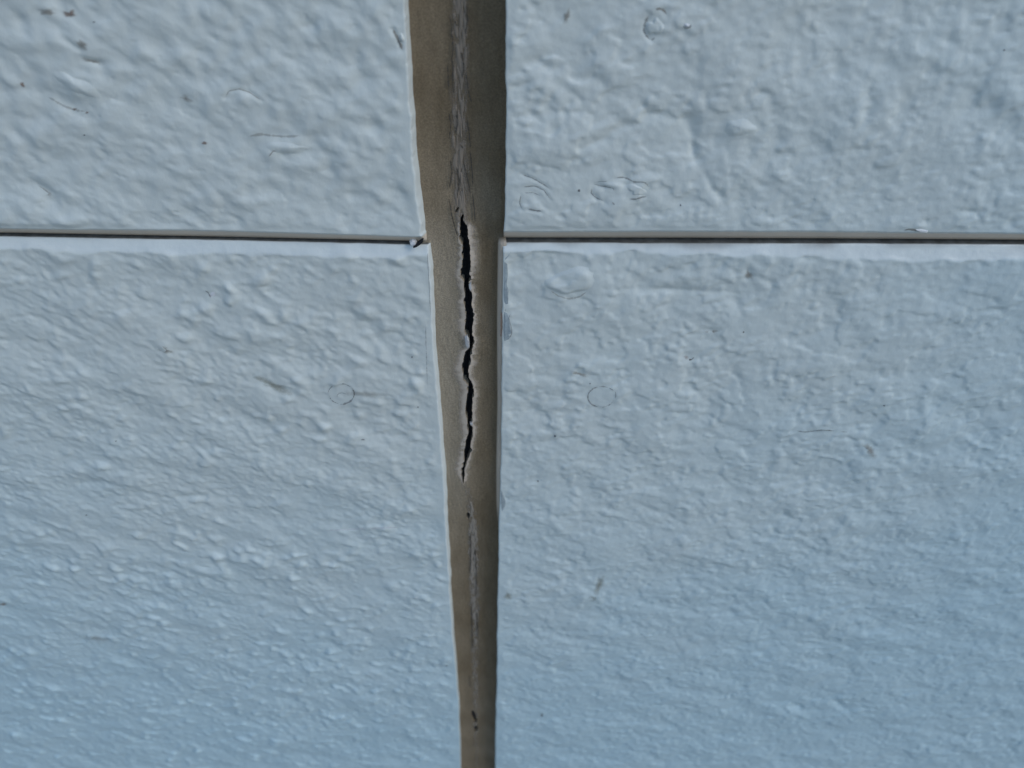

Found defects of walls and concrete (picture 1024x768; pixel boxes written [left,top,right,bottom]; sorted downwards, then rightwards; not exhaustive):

crack [455,207,478,483]